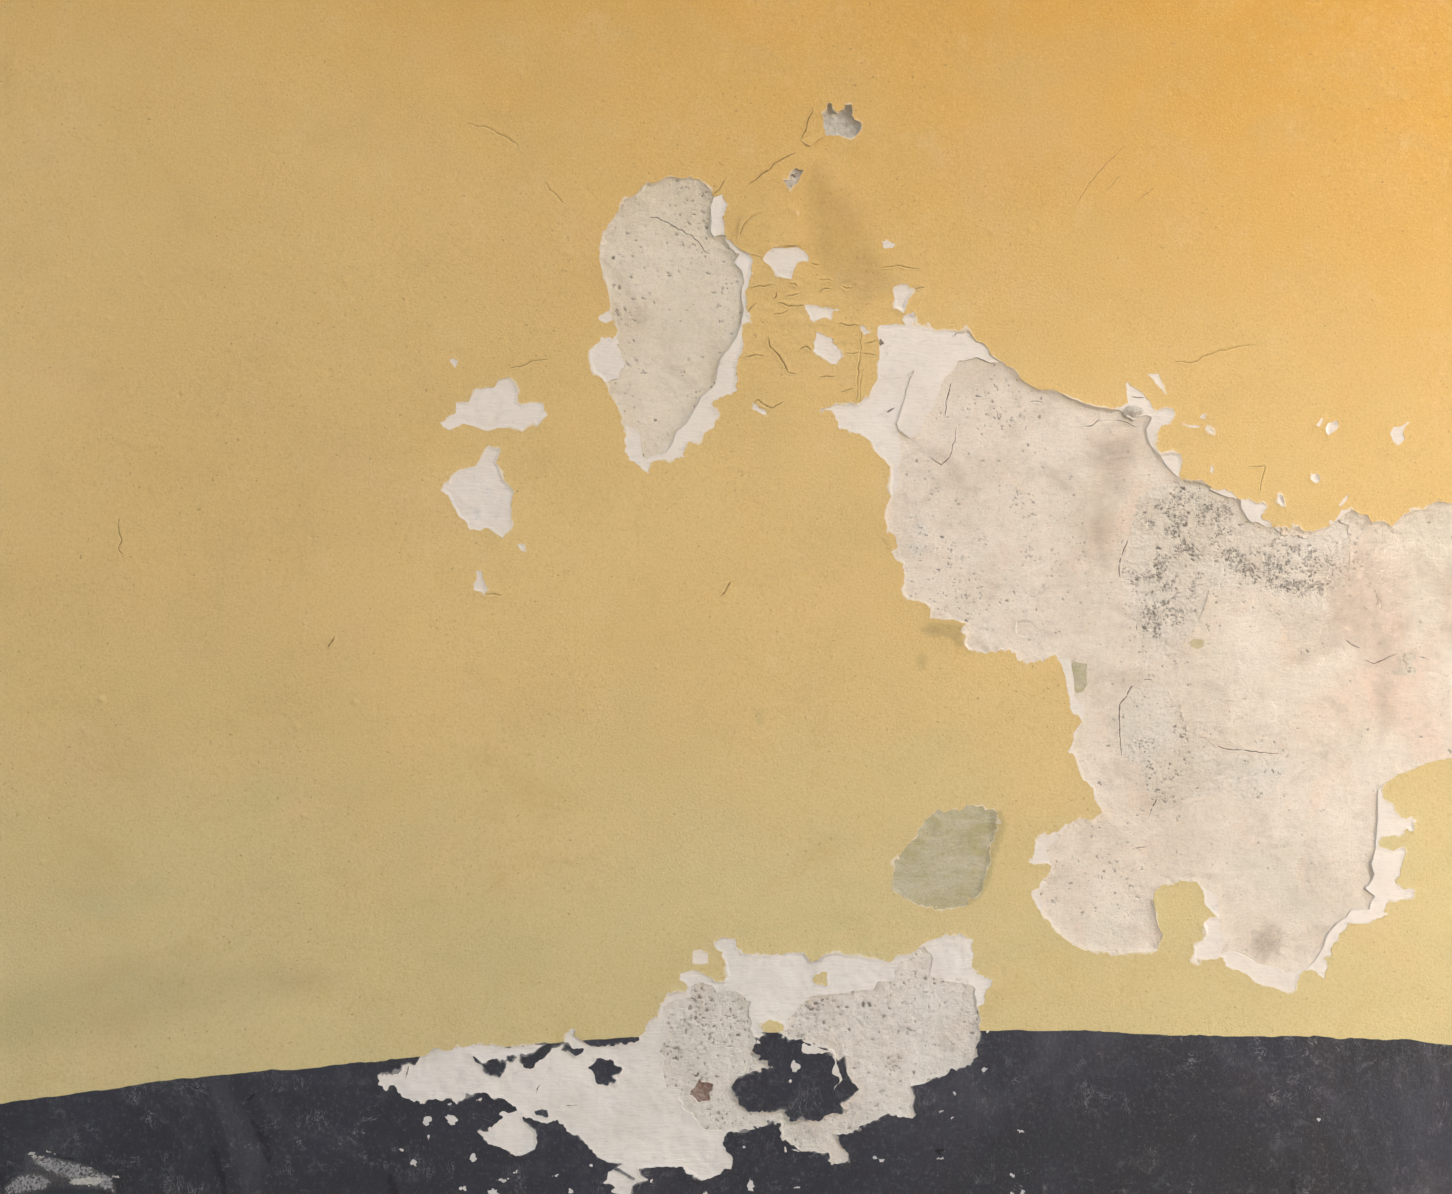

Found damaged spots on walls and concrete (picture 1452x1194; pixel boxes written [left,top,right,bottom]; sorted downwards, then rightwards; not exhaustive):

spalling [784,169,803,189]
spalling [822,104,861,138]
peeling [589,177,809,472]
crack [743,260,925,414]
peeling [441,379,548,550]
peeling [820,284,1452,992]
peeling [378,933,992,1194]